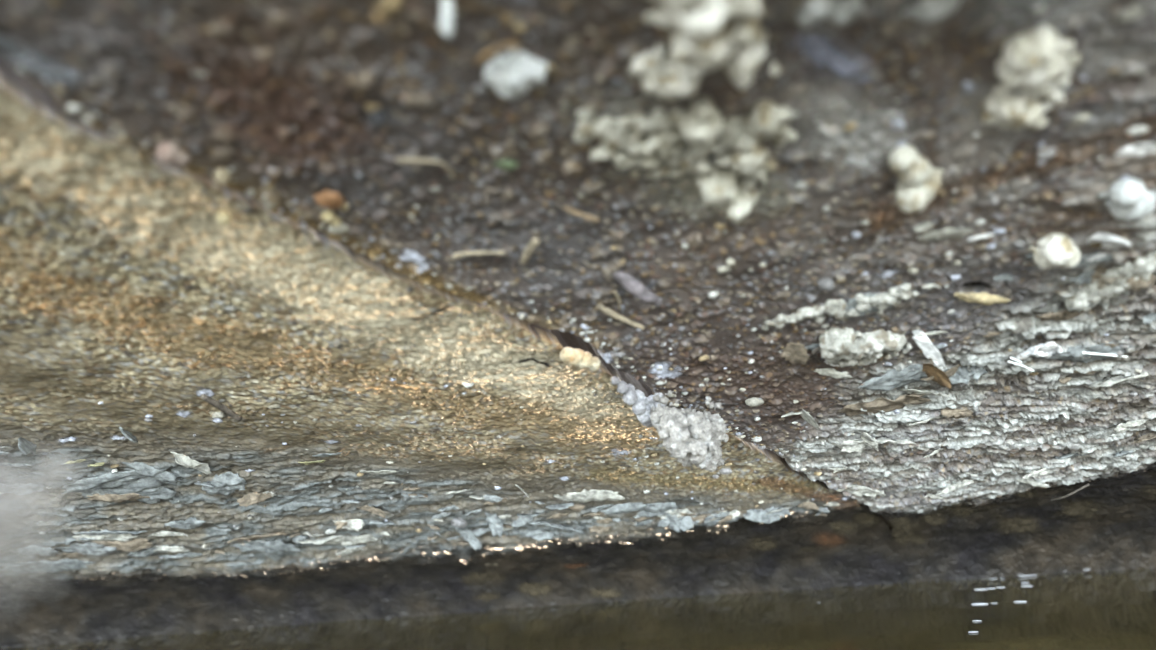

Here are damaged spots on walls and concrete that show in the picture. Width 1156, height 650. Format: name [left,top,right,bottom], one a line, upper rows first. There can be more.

efflorescence [796,0,864,81]
efflorescence [981,25,1080,130]
efflorescence [573,0,797,224]
efflorescence [814,102,944,213]
peeling [1115,143,1156,157]
leakage [1097,178,1156,221]
crack [412,305,451,320]
peeling [954,274,1014,306]
peeling [1069,233,1156,291]
crack [519,358,551,368]
peeling [781,329,989,453]
peeling [1016,341,1149,388]